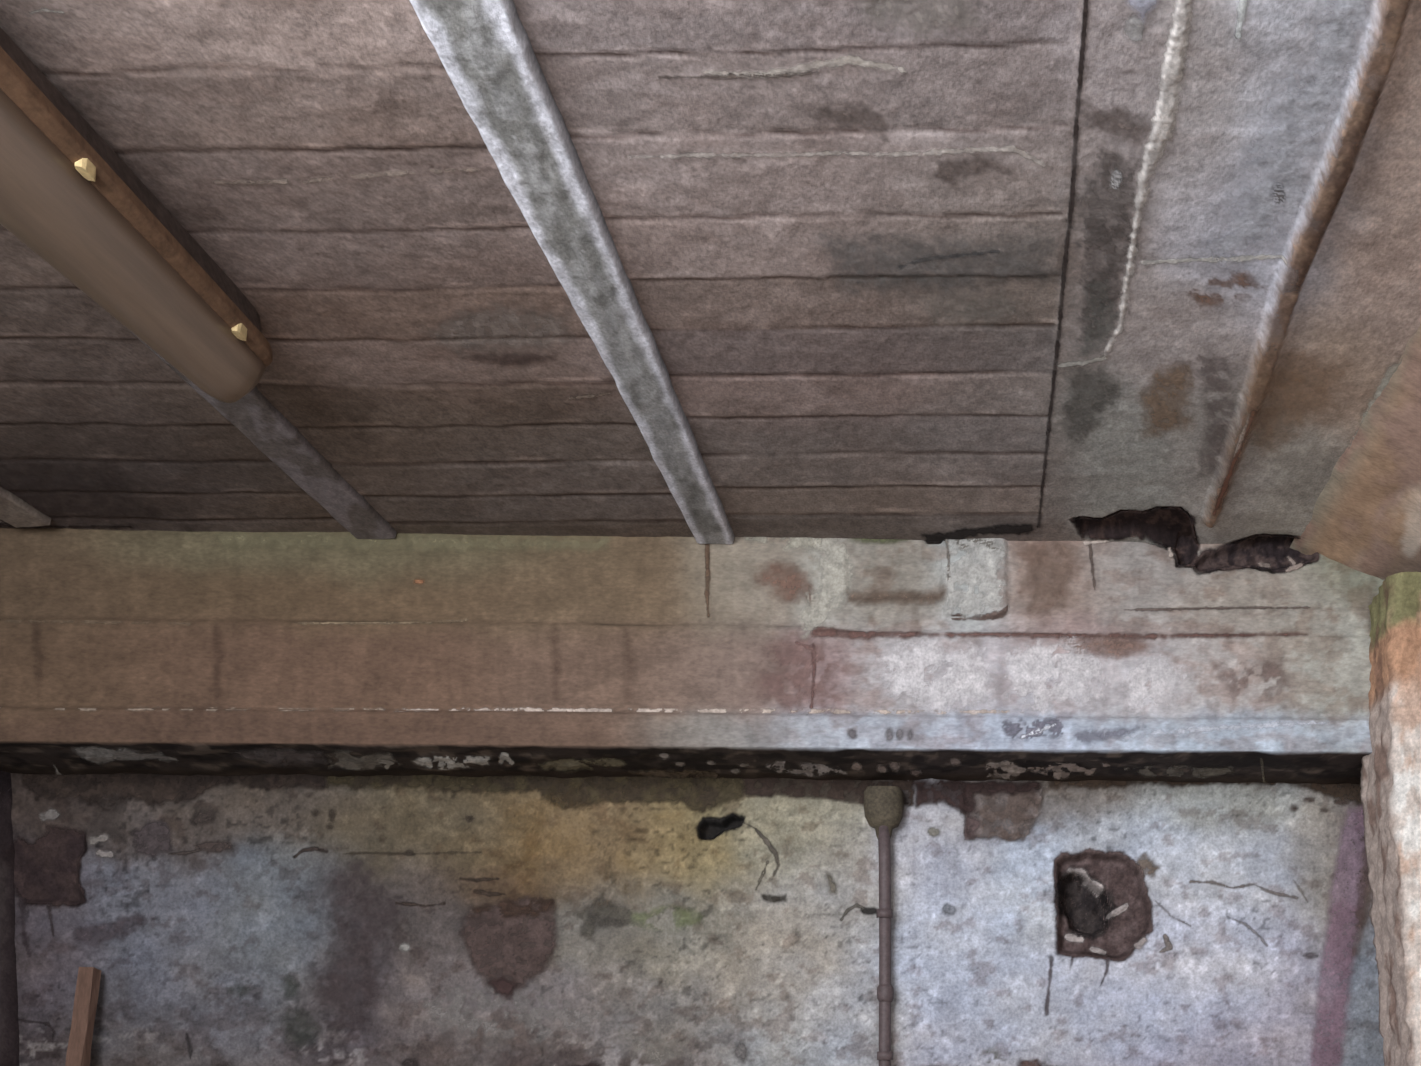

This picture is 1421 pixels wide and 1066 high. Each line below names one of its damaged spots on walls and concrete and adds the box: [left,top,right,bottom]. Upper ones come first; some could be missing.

damp [1057,0,1377,438]
crack [1037,0,1088,528]
spalling [1070,506,1319,589]
peeling [75,747,177,764]
peeling [231,749,396,770]
peeling [414,752,514,770]
peeling [540,753,748,779]
flaking render [766,758,1232,842]
spalling [13,809,113,936]
spalling [1045,848,1159,1015]